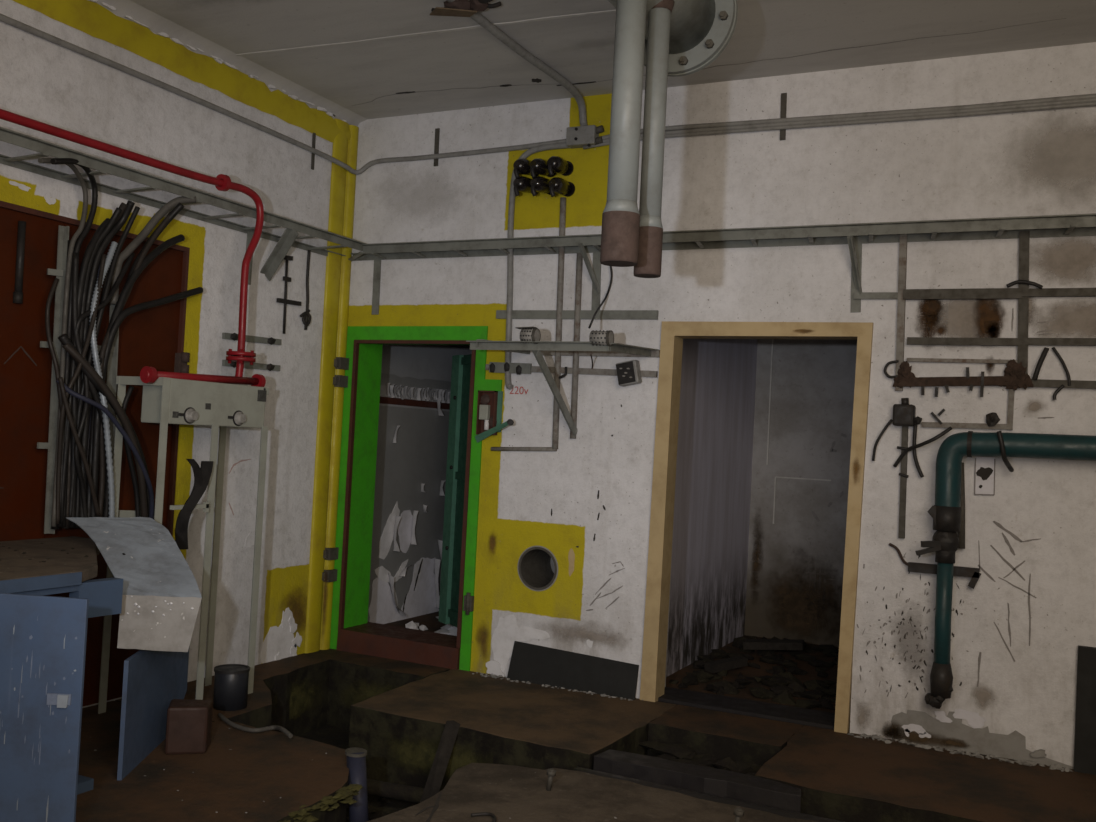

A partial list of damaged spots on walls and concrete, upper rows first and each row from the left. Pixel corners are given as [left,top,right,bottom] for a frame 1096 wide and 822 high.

peeling [90,0,238,69]
rust [919,300,945,337]
rust [976,299,1002,338]
peeling [369,502,443,624]
water stain [752,528,762,594]
peeling [261,607,302,664]
water stain [559,628,617,644]
spalling [883,709,1074,769]